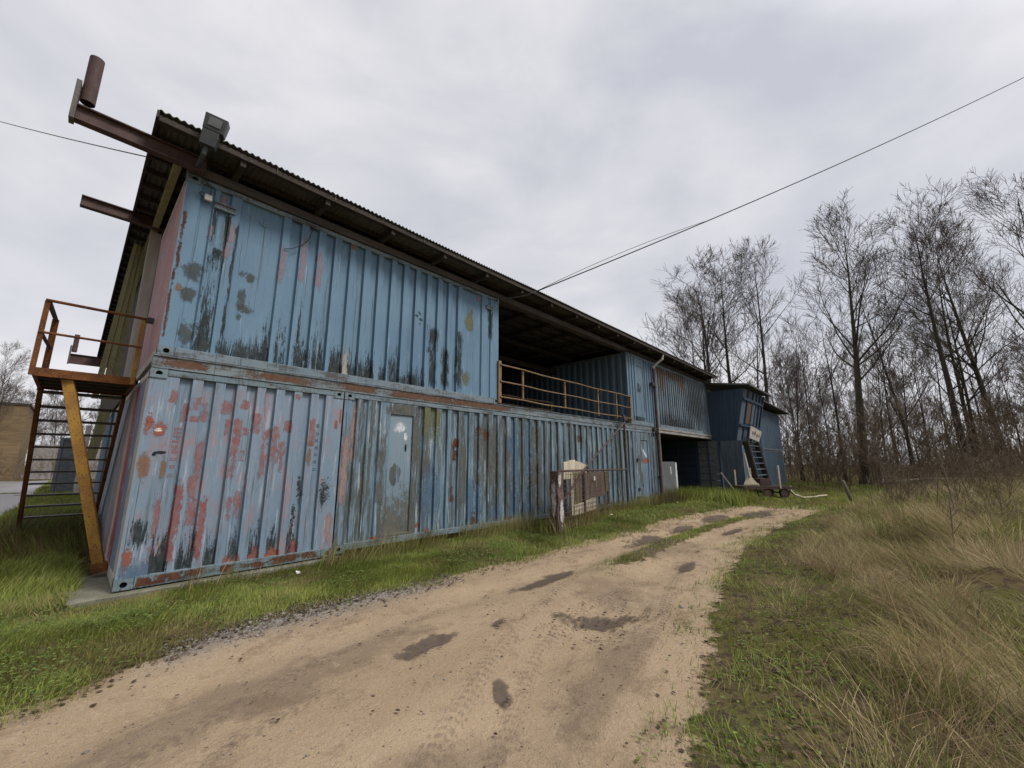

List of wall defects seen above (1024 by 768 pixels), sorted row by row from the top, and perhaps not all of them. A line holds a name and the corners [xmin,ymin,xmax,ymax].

corrosion [162,211,187,336]
water stain [177,208,463,392]
corrosion [157,357,212,372]
corrosion [245,371,317,385]
corrosion [135,568,204,587]
peeling [121,390,299,573]
water stain [126,477,303,574]
corrosion [219,551,317,573]
peeling [334,404,385,506]
peeling [386,404,422,465]
peeling [459,416,499,524]
peeling [528,423,564,527]